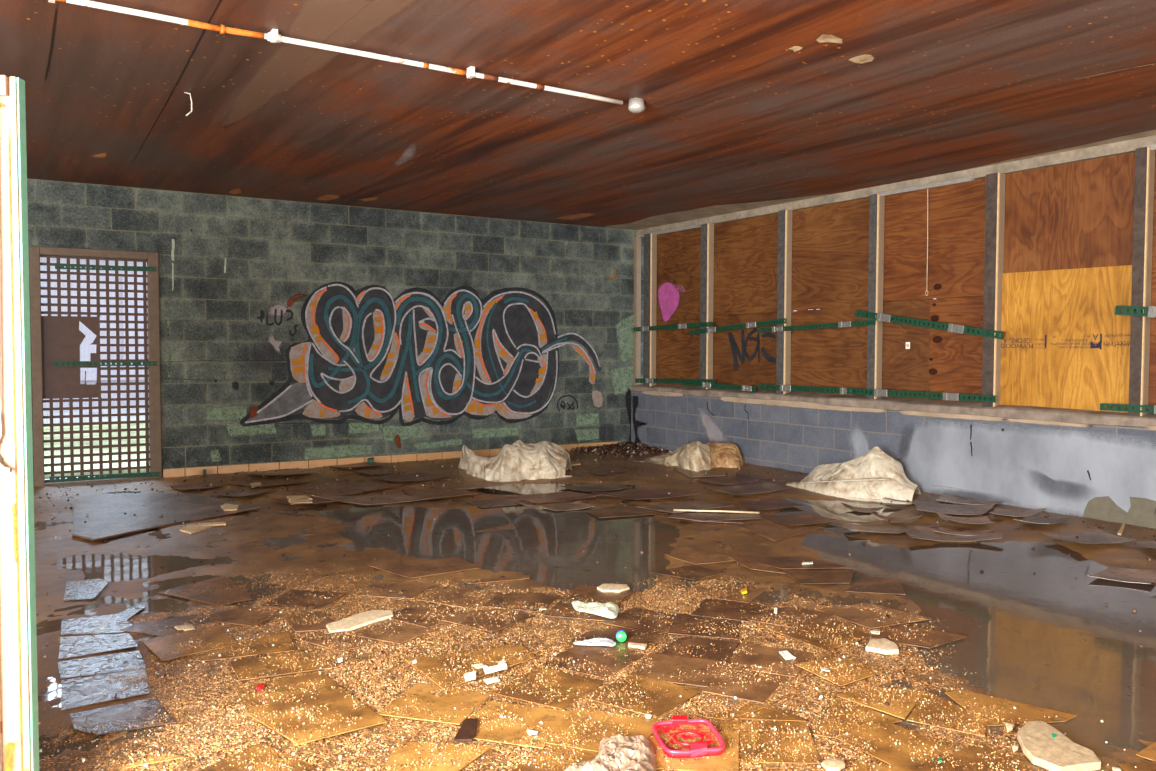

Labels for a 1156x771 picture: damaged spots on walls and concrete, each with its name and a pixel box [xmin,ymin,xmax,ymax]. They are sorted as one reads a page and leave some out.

corrosion [187,19,265,39]
peeling [816,34,843,44]
peeling [849,54,874,64]